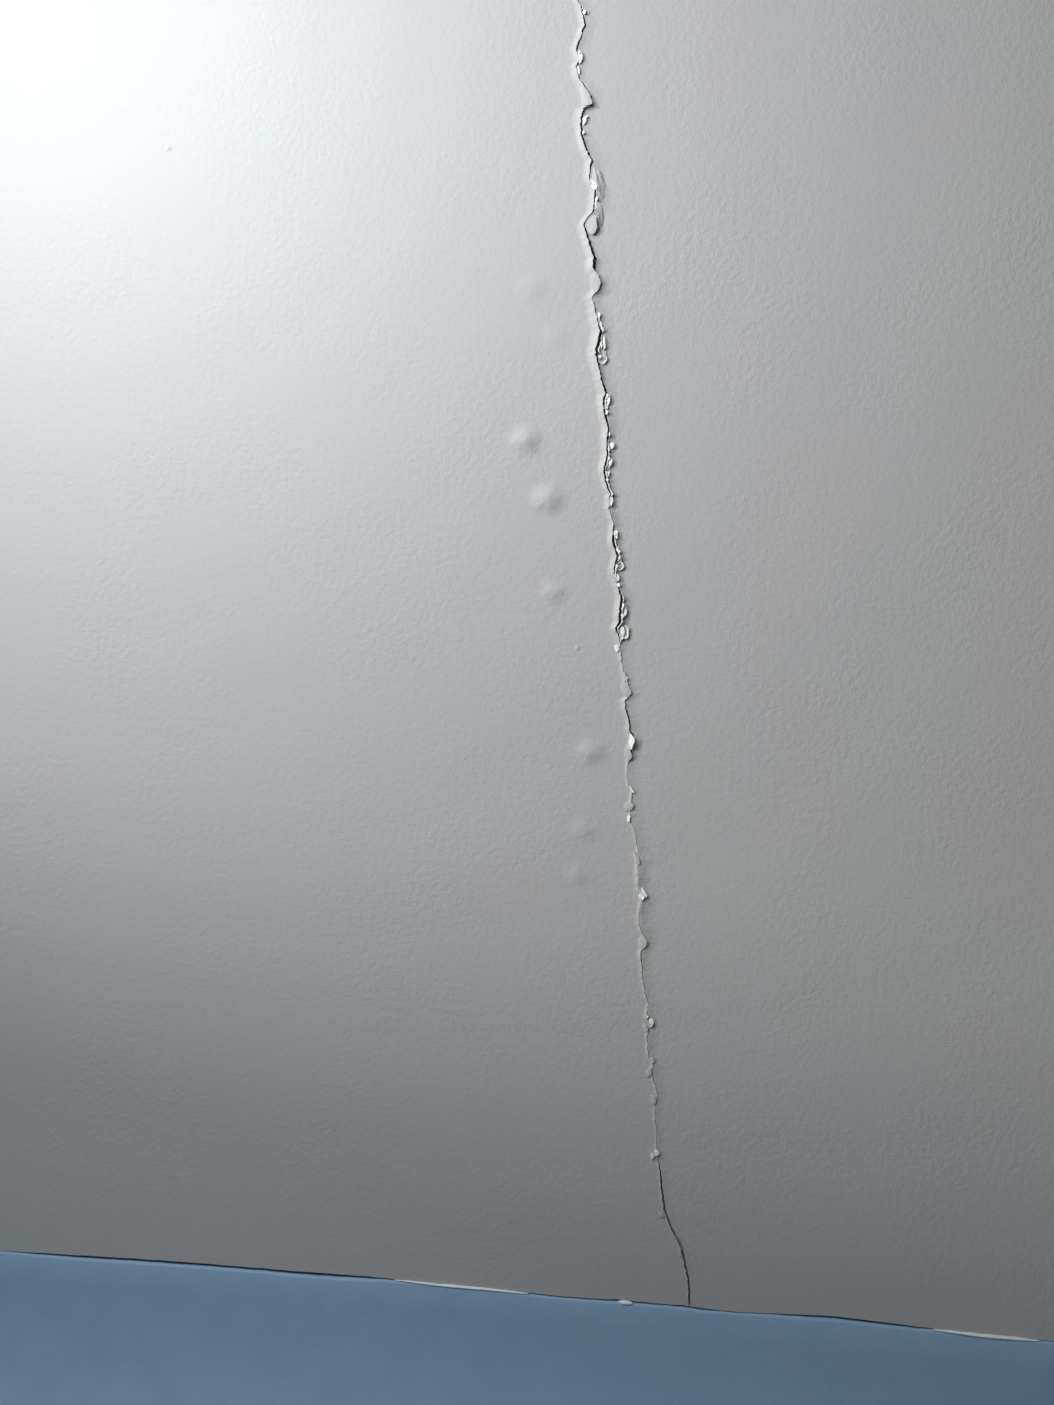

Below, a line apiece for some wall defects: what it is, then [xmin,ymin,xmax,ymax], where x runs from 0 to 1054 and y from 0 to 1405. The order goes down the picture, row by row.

crack [568,0,698,1307]